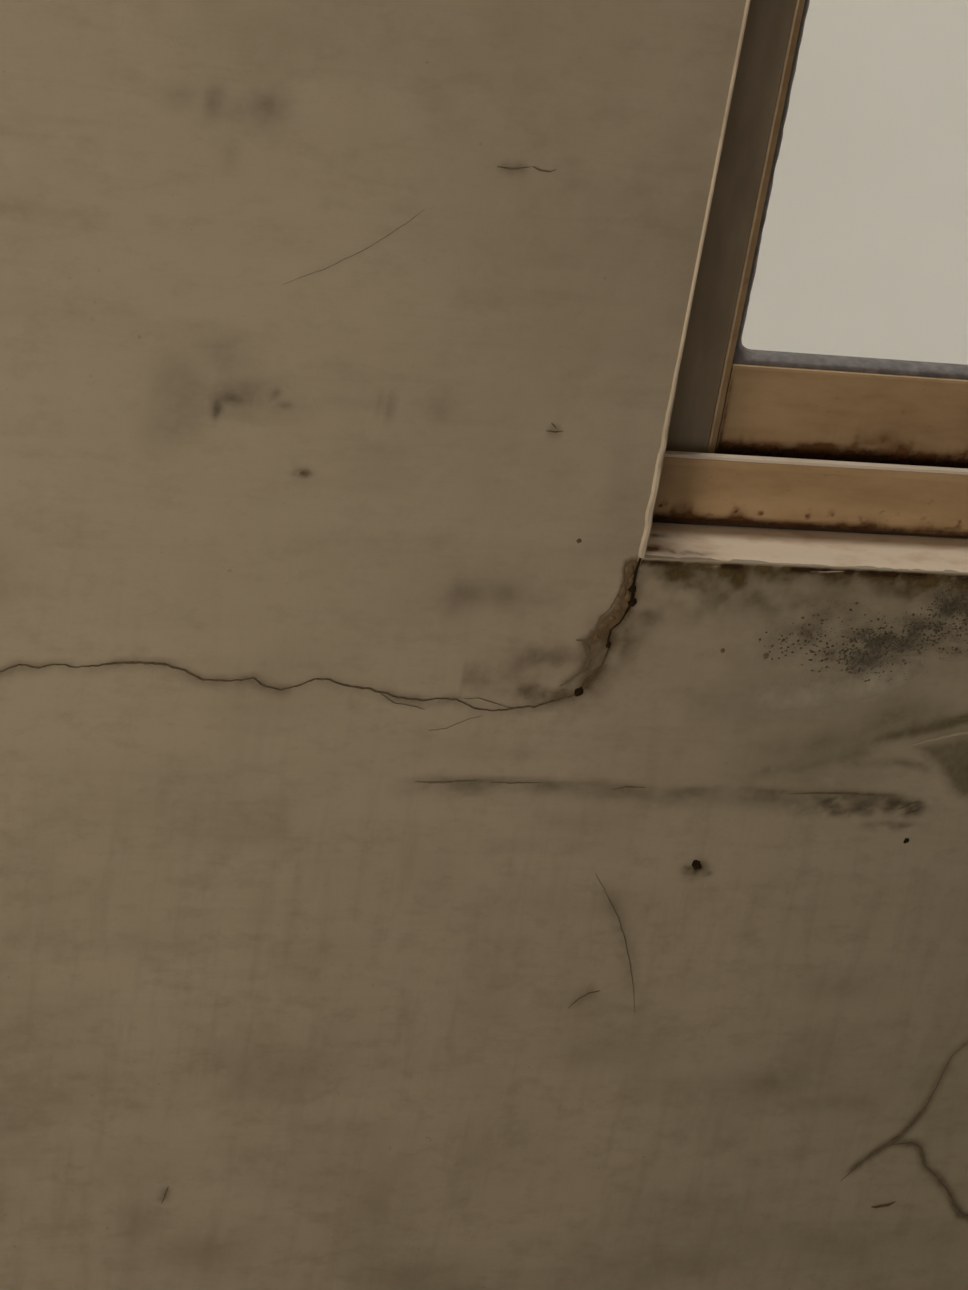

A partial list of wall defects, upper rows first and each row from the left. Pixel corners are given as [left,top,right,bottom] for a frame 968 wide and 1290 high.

crack [0,558,641,731]
water stain [722,564,747,589]
water stain [750,567,968,711]
crack [842,1046,968,1218]